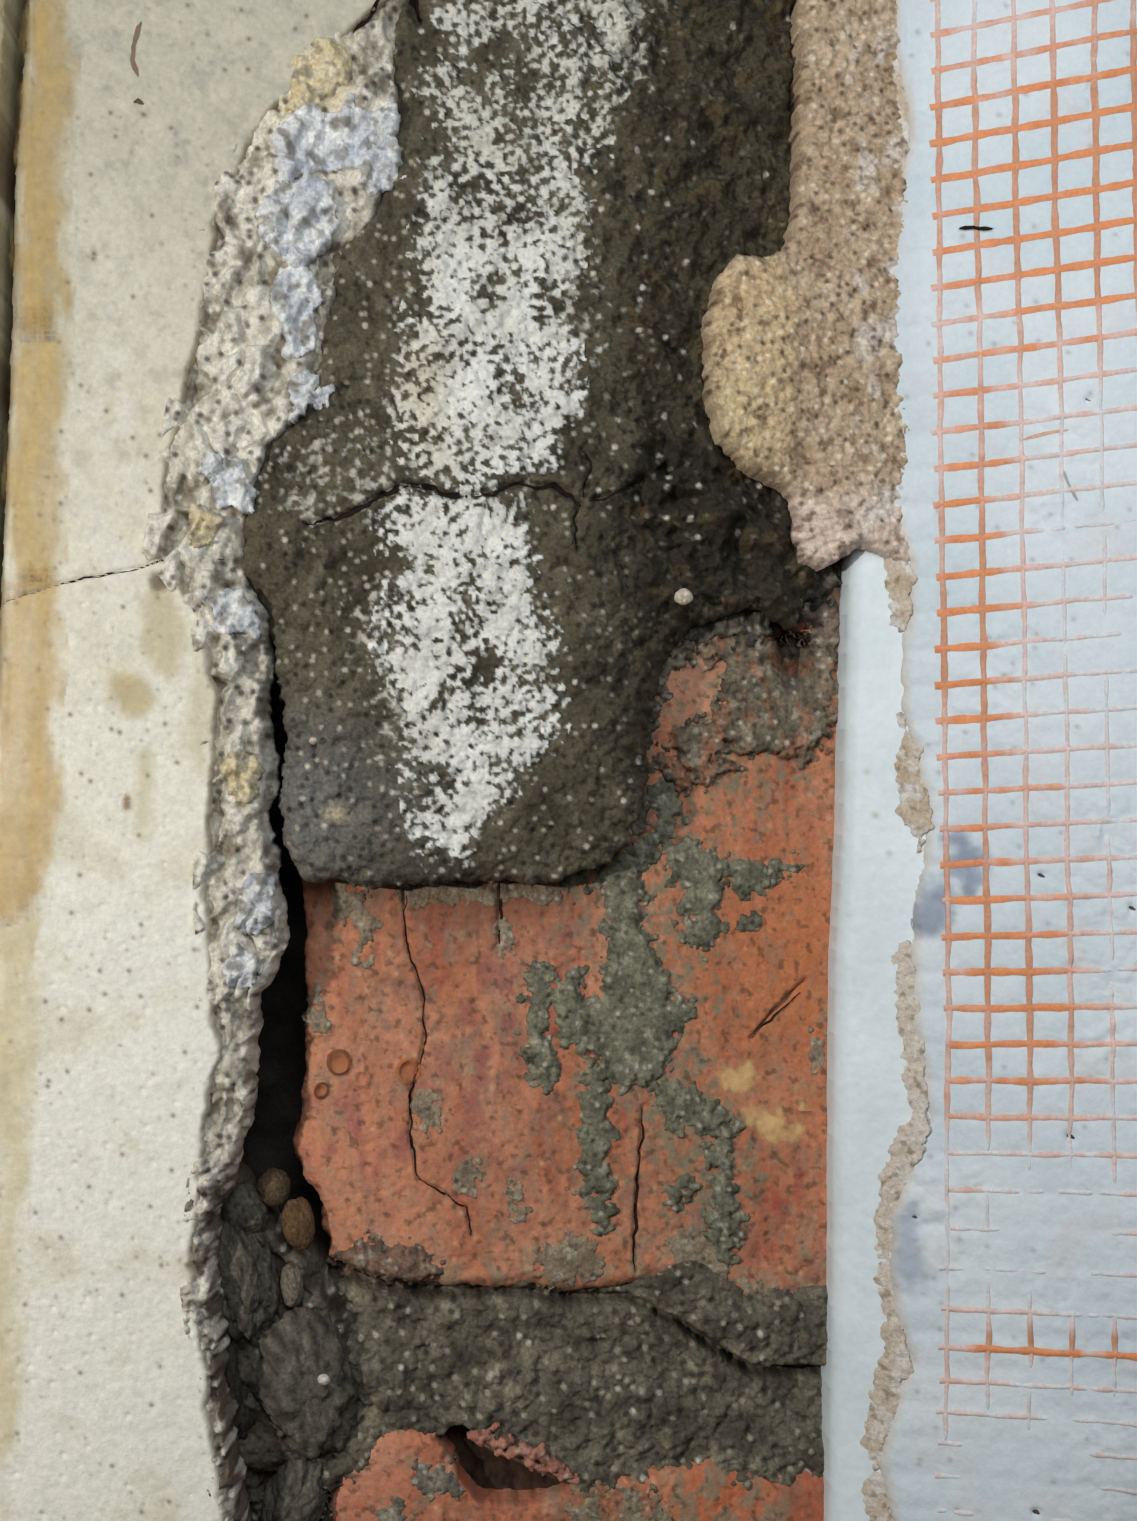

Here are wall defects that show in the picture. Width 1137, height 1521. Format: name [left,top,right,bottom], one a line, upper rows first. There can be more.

peeling [890,59,911,143]
water stain [0,0,69,913]
spalling [142,0,410,1521]
efflorescence [269,0,667,867]
spalling [674,588,693,605]
peeling [884,558,918,632]
peeling [894,711,935,853]
crack [403,895,472,1235]
peeling [860,940,931,1521]
spalling [445,1422,580,1490]